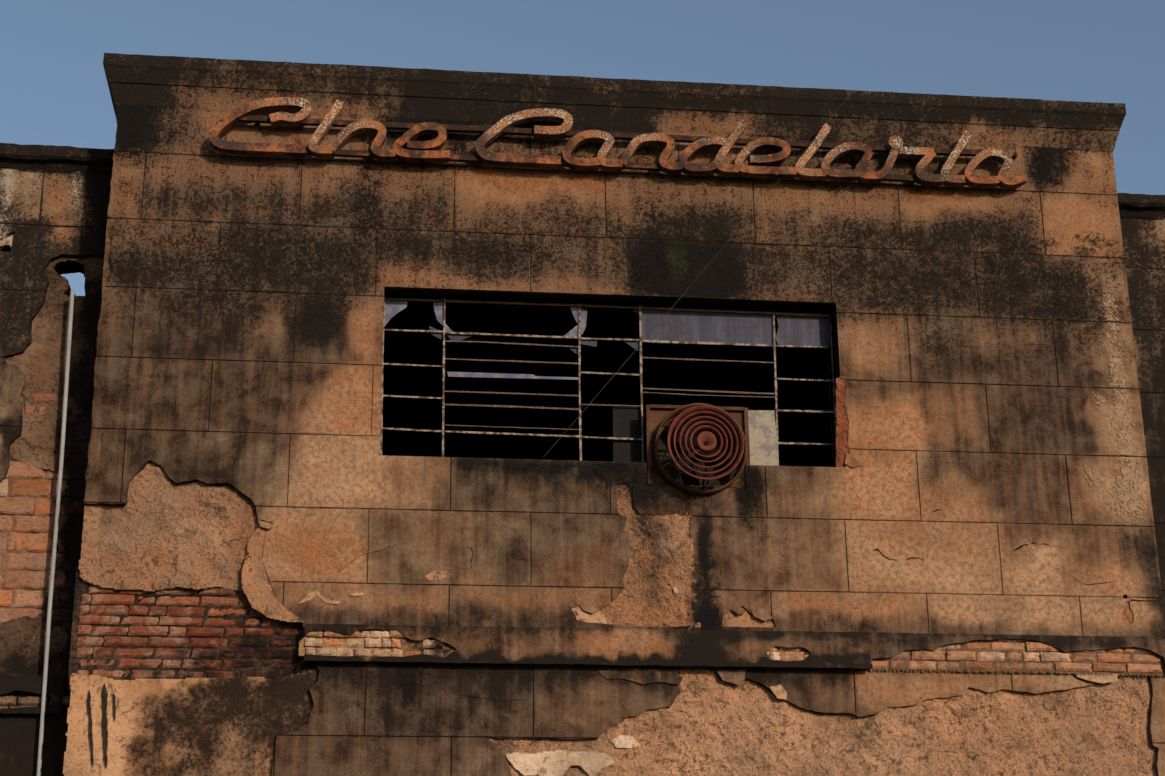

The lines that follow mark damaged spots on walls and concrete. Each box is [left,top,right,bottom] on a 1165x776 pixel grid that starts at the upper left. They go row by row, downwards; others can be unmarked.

water stain [0,168,43,241]
water stain [106,165,764,348]
rust [836,376,863,468]
spalling [0,217,454,776]
spalling [572,483,701,630]
water stain [688,511,722,630]
spalling [487,639,1162,776]